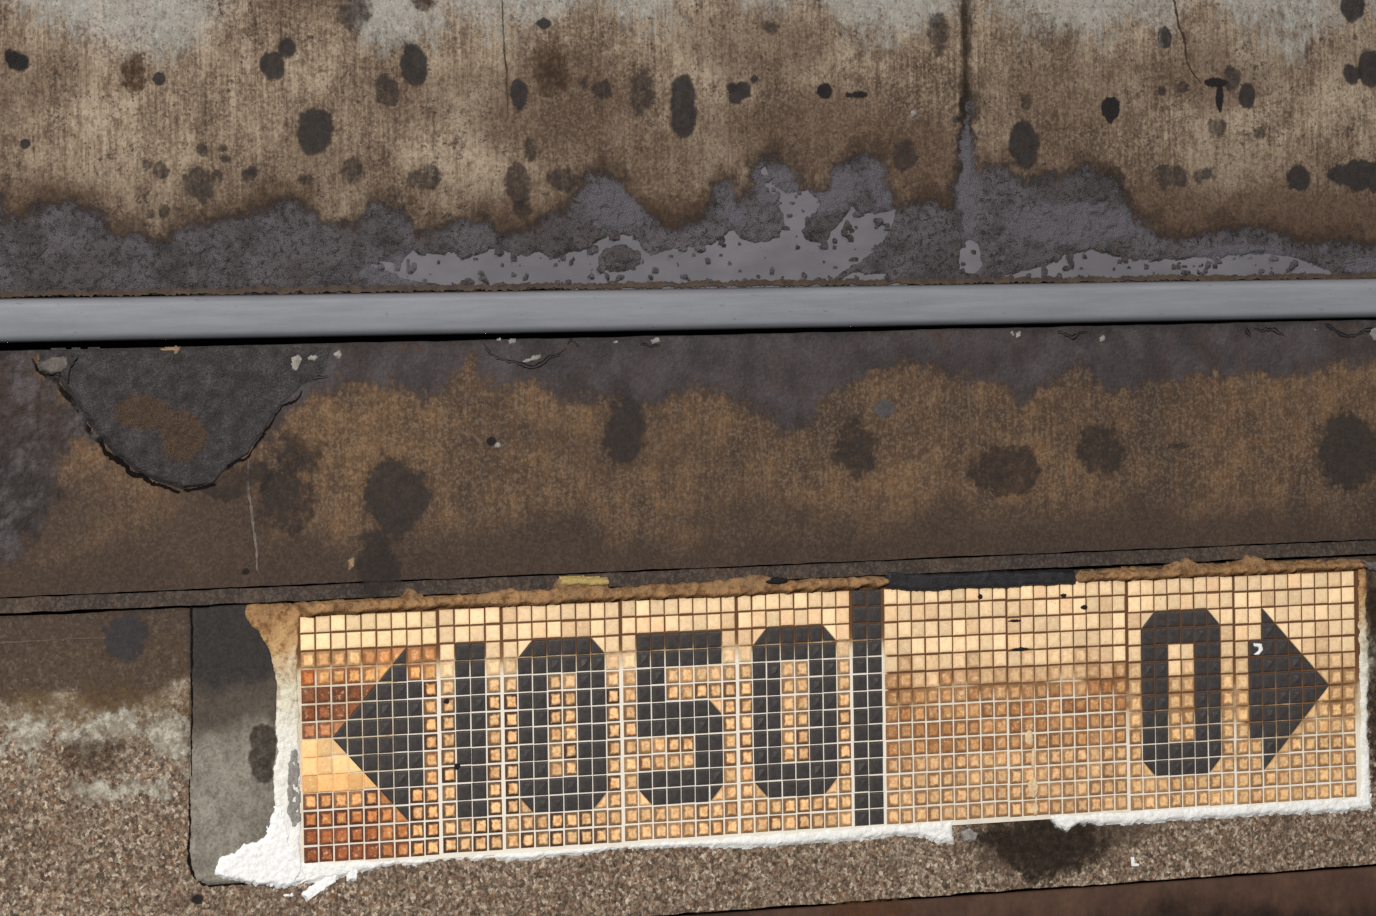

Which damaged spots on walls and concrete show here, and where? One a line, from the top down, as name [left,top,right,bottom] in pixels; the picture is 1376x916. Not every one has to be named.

leakage [21,0,204,90]
leakage [359,0,444,51]
crack [501,0,509,109]
spalling [817,83,867,98]
leakage [824,0,969,48]
crack [1173,0,1200,81]
leakage [1226,0,1343,60]
spalling [36,356,68,375]
spalling [291,355,317,371]
leakage [246,459,258,570]
leakage [1365,576,1376,781]
leakage [0,708,191,804]